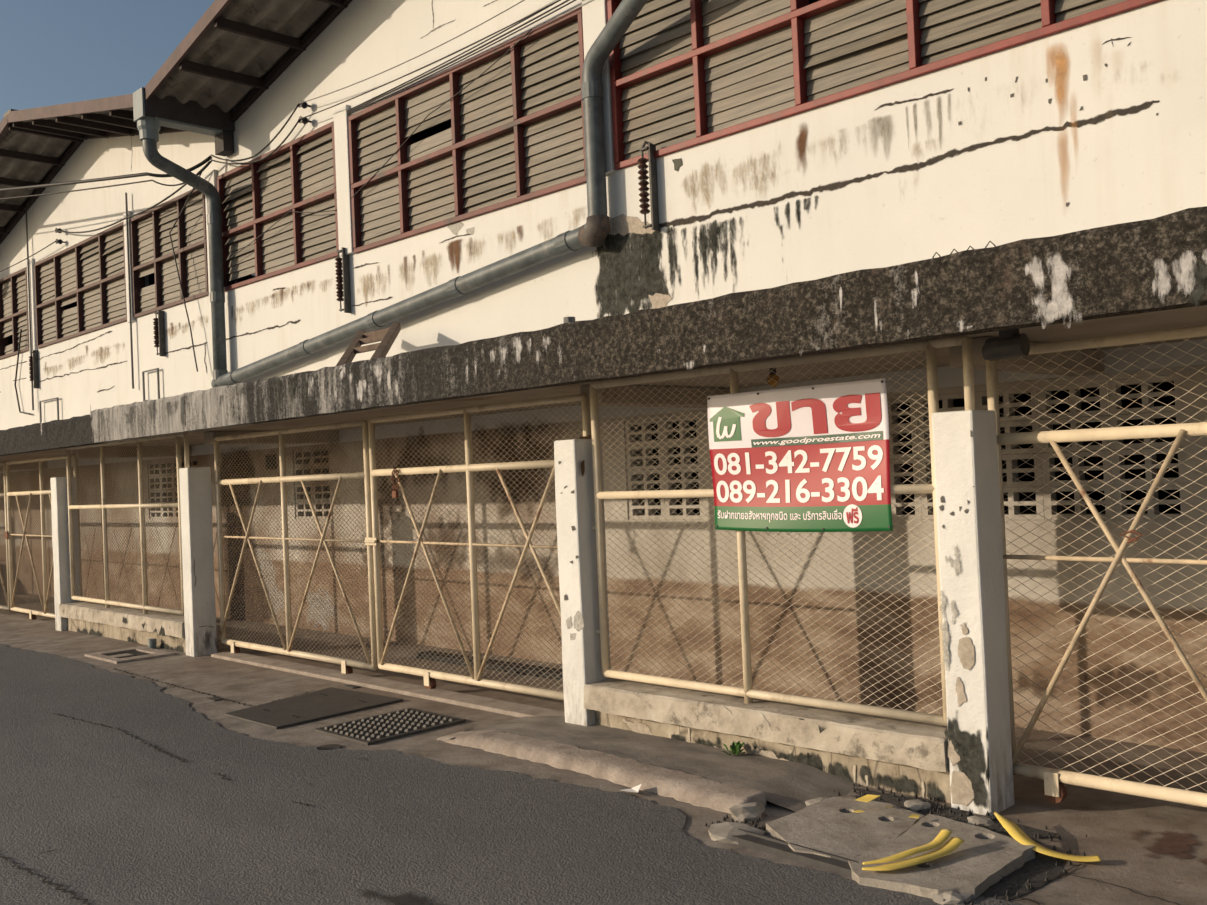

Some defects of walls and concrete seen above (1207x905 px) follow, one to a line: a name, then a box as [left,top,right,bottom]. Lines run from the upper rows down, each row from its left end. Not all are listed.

rust [1054,51,1067,104]
rust [797,128,807,162]
crack [659,100,1160,228]
damp [592,217,742,318]
mould [1189,262,1207,306]
efflorescence [490,337,560,373]
damp [268,364,398,411]
peeling [945,546,962,575]
peeling [940,591,975,707]
crack [58,714,187,762]
mould [944,719,990,808]
crack [0,850,91,905]